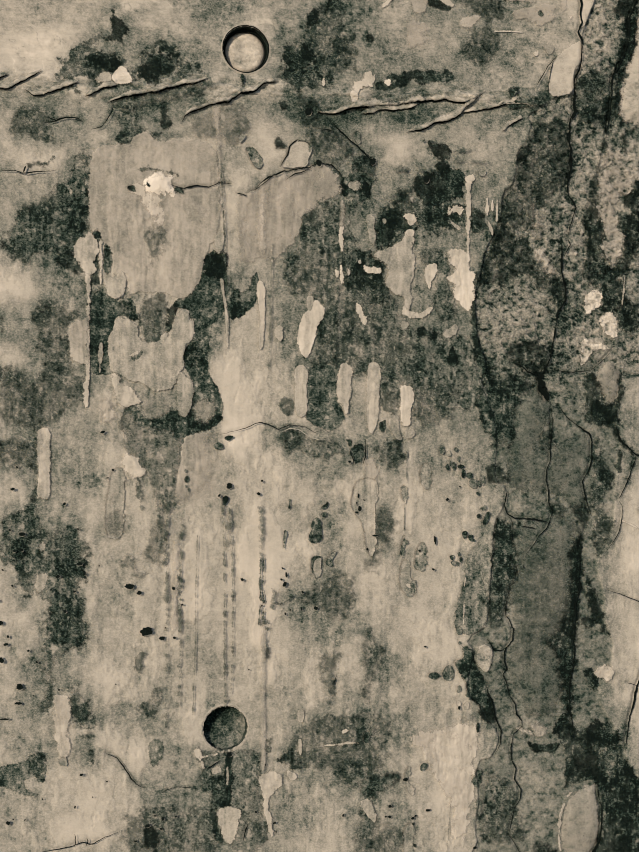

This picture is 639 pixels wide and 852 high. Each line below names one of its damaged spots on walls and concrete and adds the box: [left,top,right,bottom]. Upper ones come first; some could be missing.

water stain [0,301,85,431]
water stain [1,149,92,274]
spalling [89,231,259,451]
crack [171,122,372,196]
peeling [297,296,325,358]
spalling [305,363,345,431]
peeling [358,212,433,319]
crack [486,0,613,852]
water stain [516,0,639,852]
crack [605,427,639,553]
water stain [0,440,92,712]
crack [625,680,639,752]